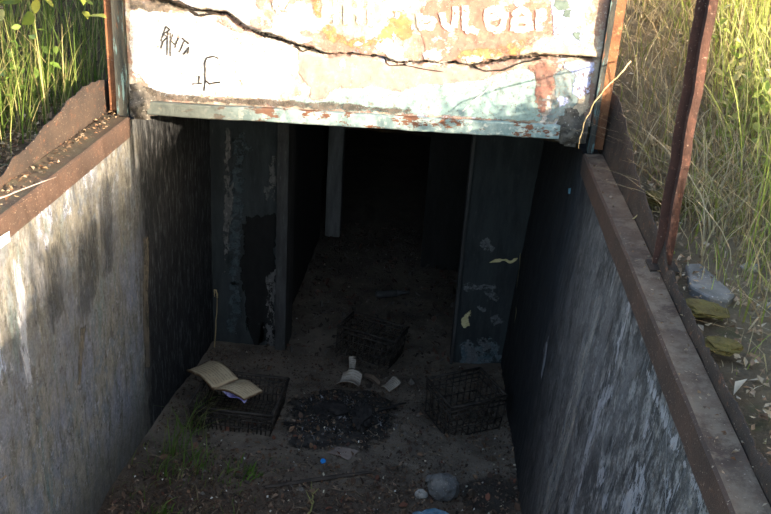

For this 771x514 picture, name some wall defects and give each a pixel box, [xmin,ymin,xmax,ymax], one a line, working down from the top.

peeling [129,0,598,107]
crack [151,0,592,72]
peeling [459,337,502,364]
damp [543,299,602,514]
damp [570,302,630,514]